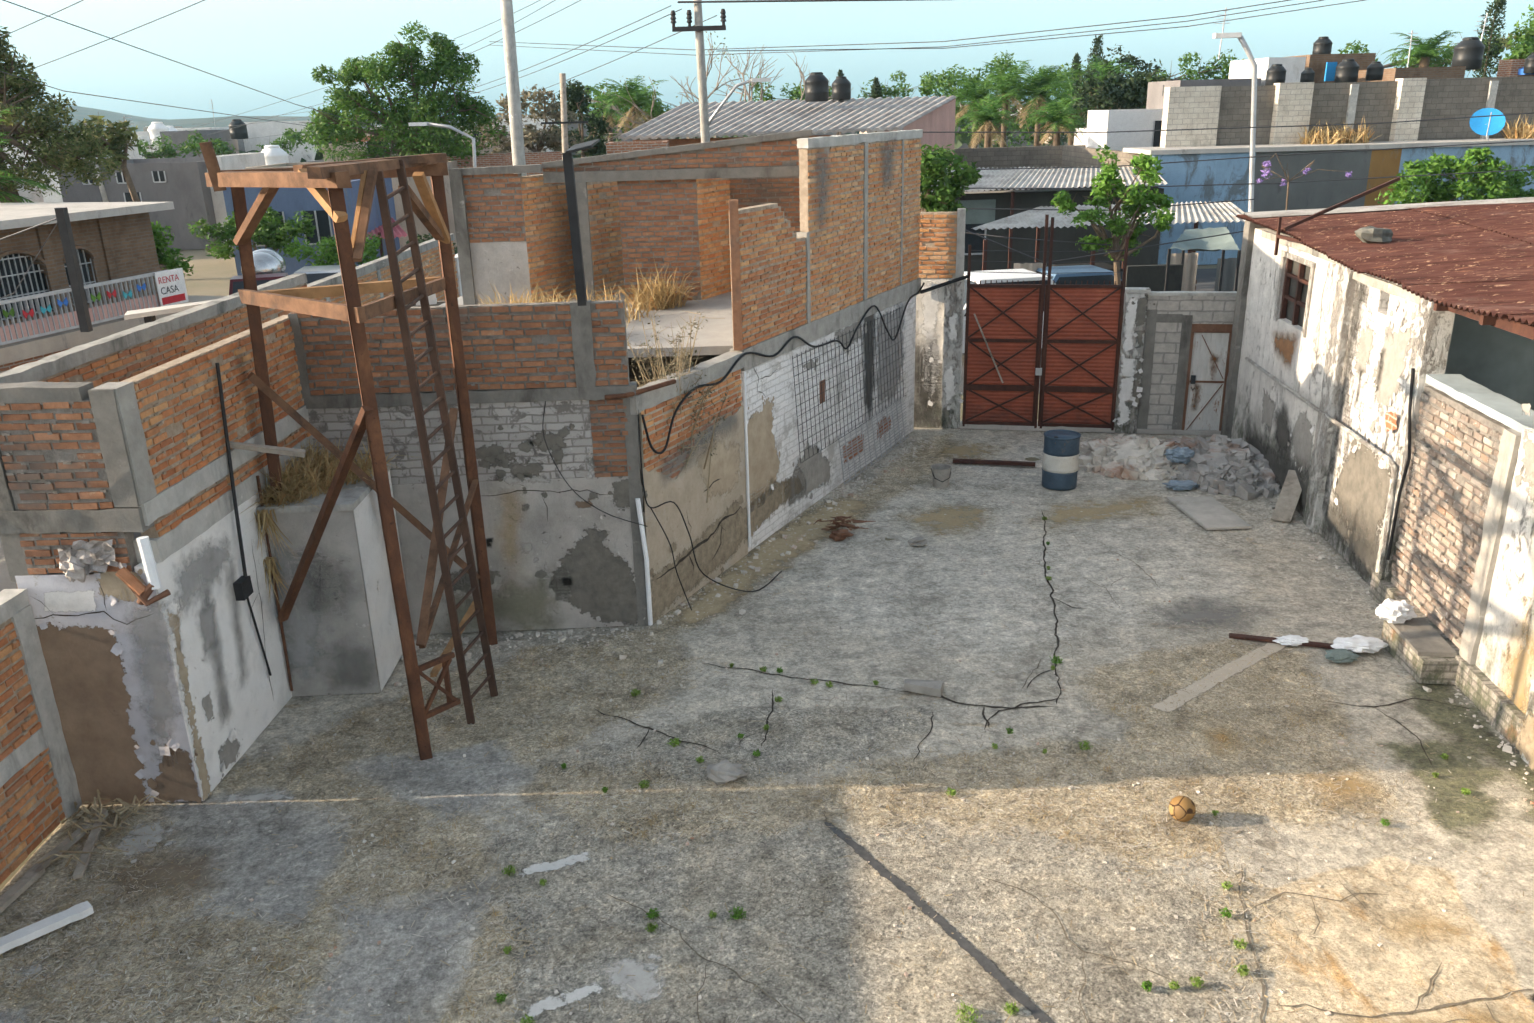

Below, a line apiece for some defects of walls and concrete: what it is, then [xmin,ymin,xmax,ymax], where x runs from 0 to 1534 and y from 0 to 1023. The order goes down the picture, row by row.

corrosion [1274,334,1296,366]
peeling [464,424,575,511]
crack [657,479,741,579]
peeling [535,395,892,628]
peeling [1261,389,1276,433]
peeling [1287,412,1315,472]
spalling [1515,403,1534,502]
peeling [94,562,147,608]
crack [595,510,1160,760]
peeling [36,602,243,805]
spalling [1514,711,1534,771]
crack [1239,866,1533,1023]